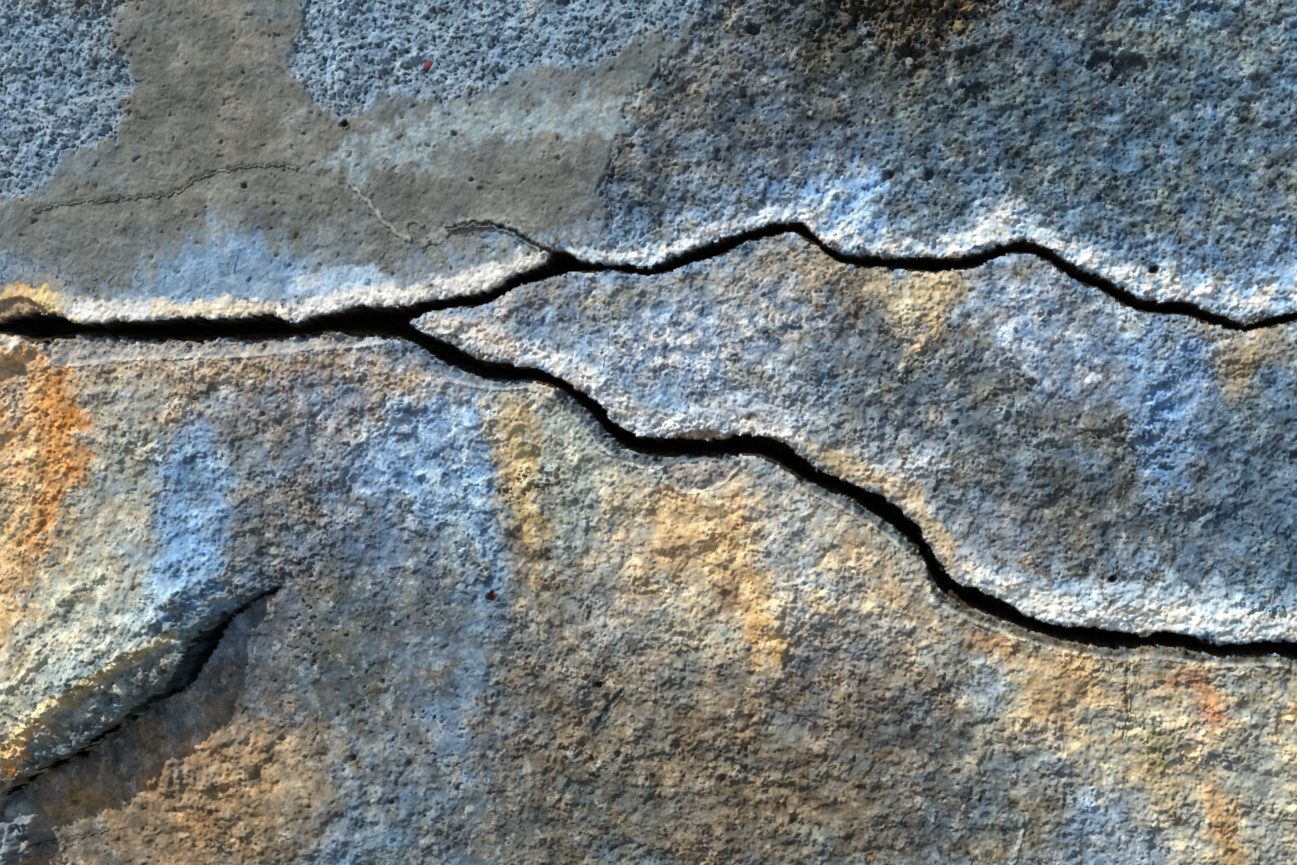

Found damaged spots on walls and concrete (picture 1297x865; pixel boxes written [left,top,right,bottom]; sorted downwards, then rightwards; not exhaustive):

crack [31,161,300,212]
crack [599,145,617,228]
crack [0,180,1297,741]